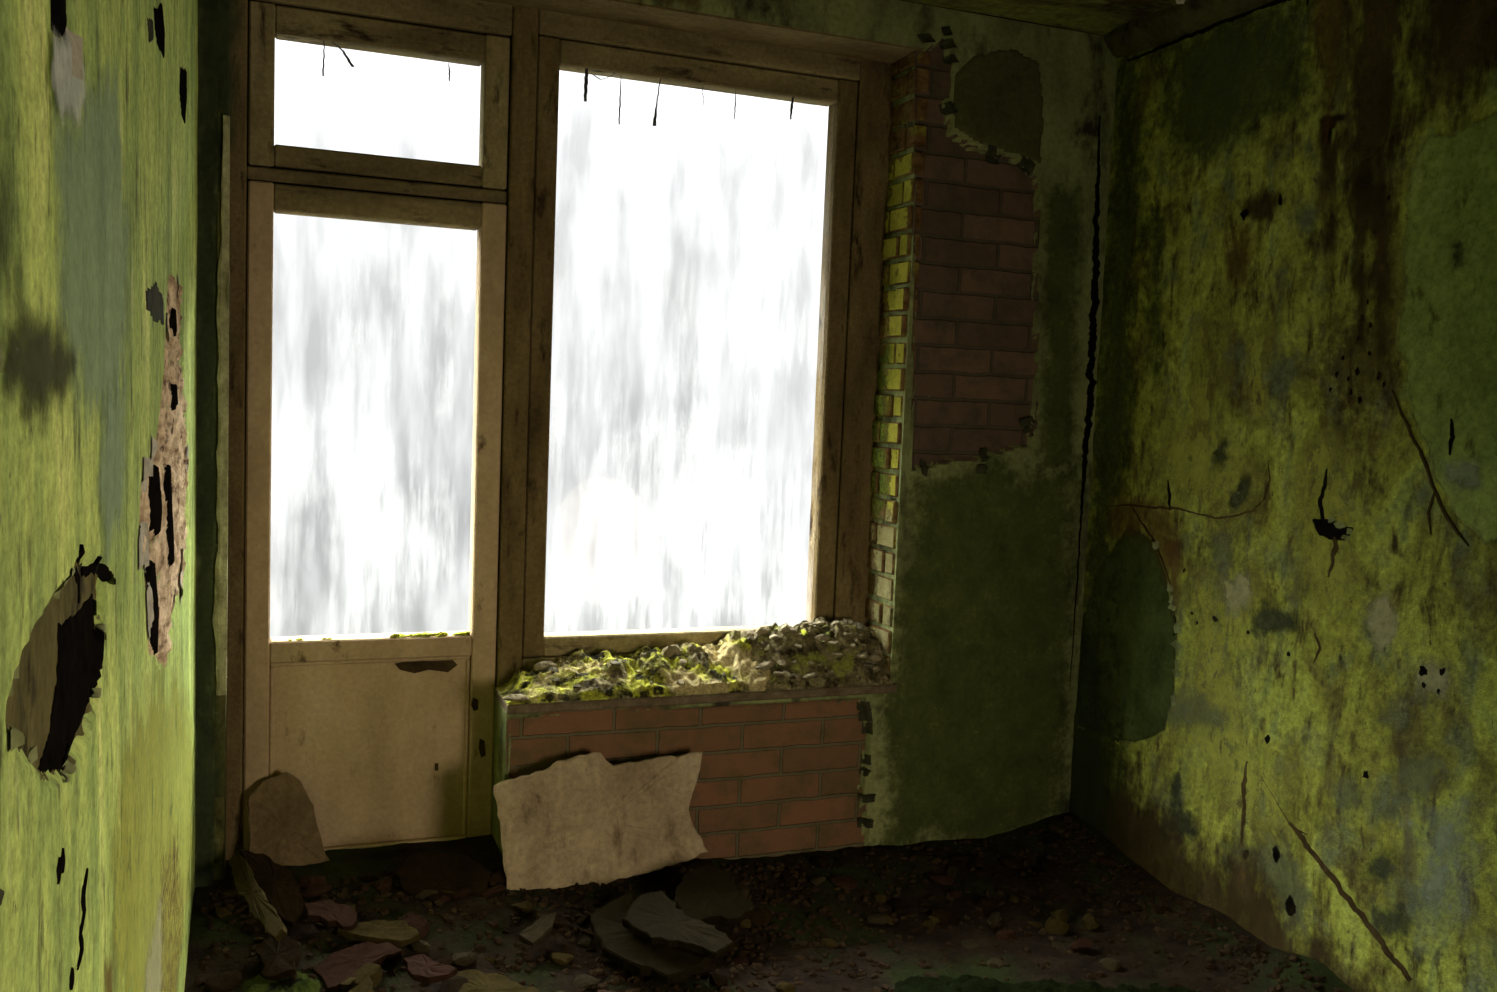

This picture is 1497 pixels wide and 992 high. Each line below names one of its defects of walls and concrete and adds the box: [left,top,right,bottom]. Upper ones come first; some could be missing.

damp [1323,0,1497,358]
flaking render [0,312,77,422]
flaking render [138,274,189,668]
damp [1069,0,1385,992]
spalling [1311,469,1353,578]
crack [1391,390,1469,546]
flaking render [5,544,116,783]
crack [1240,761,1412,983]
damp [1368,853,1395,880]
damp [1371,904,1408,934]